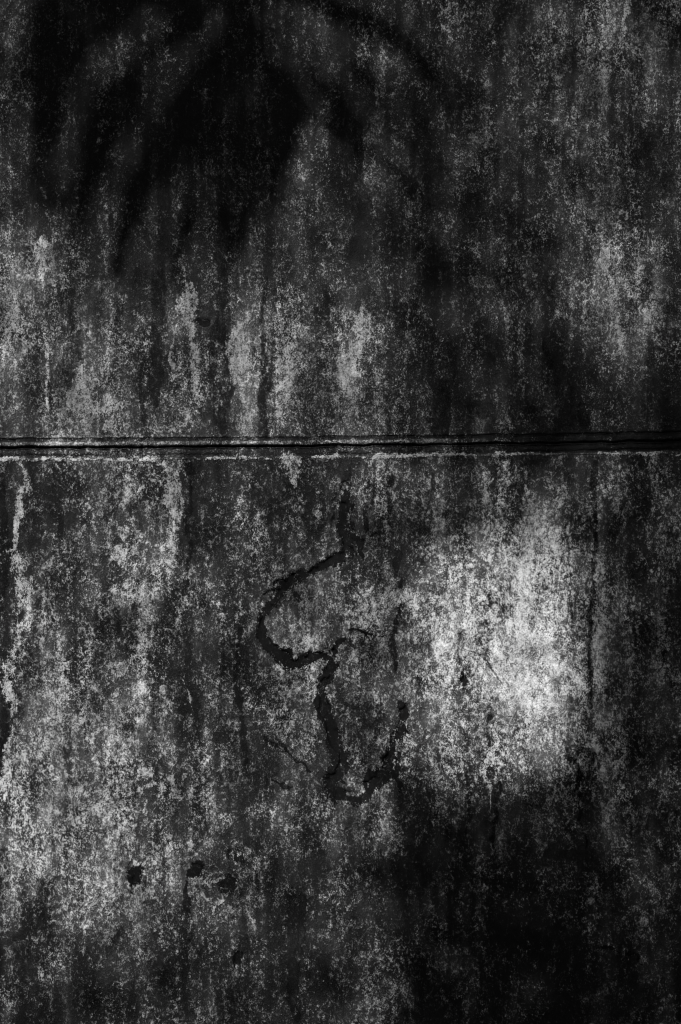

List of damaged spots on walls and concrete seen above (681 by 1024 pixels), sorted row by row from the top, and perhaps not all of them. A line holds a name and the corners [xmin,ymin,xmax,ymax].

damp [619,0,631,49]
damp [0,297,25,366]
damp [34,235,49,282]
damp [43,333,51,412]
damp [208,240,235,441]
damp [257,276,272,438]
damp [599,248,625,355]
damp [205,334,591,533]
crack [256,488,410,807]